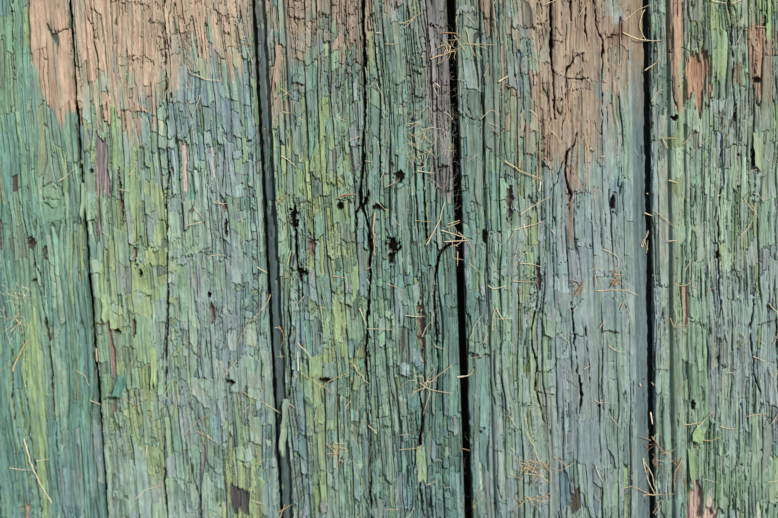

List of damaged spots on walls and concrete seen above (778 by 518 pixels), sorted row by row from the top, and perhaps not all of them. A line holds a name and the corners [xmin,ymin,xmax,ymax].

peeling [26,0,254,243]
peeling [309,131,337,186]
peeling [263,0,403,128]
peeling [348,126,361,175]
peeling [479,0,505,40]
peeling [505,0,634,195]
peeling [667,0,713,120]
crack [354,0,373,518]
crack [413,154,455,518]
peeling [686,425,744,518]